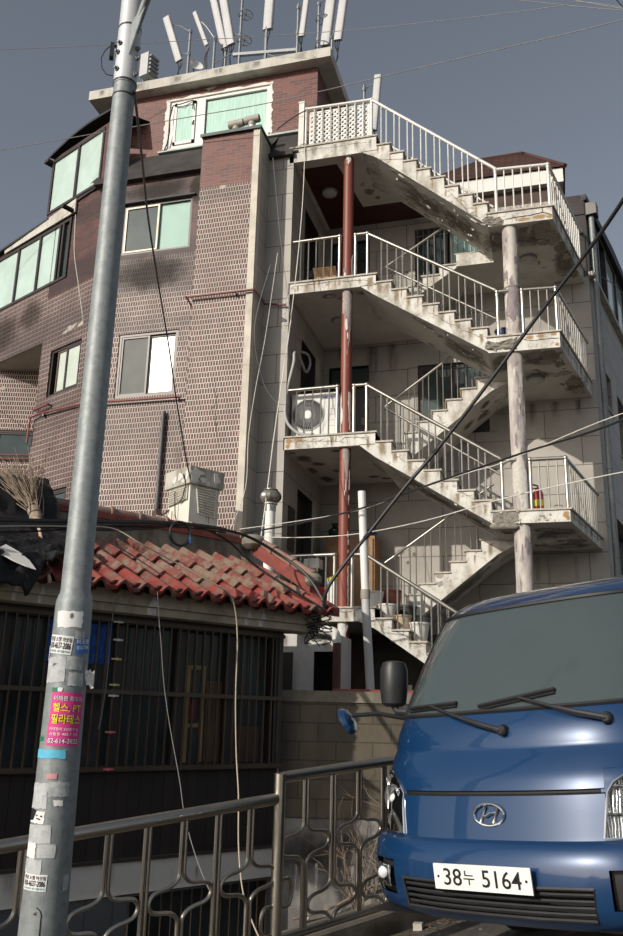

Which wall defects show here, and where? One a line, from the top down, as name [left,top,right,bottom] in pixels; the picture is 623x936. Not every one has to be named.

water stain [405,186,502,251]
peeling [390,169,570,372]
peeling [340,392,351,432]
peeling [333,447,350,505]
peeling [370,350,590,563]